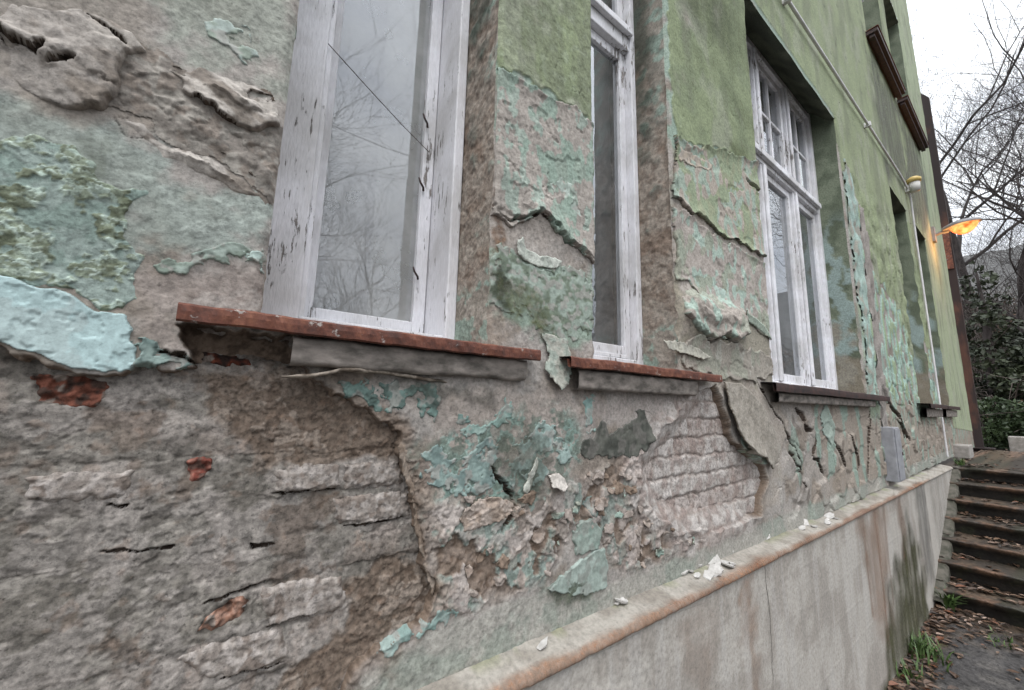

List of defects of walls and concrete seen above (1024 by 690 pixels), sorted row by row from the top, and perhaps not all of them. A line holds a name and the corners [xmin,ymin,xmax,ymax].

flaking render [0,134,779,690]
flaking render [489,67,595,390]
peeling [820,405,836,445]
peeling [842,158,877,401]